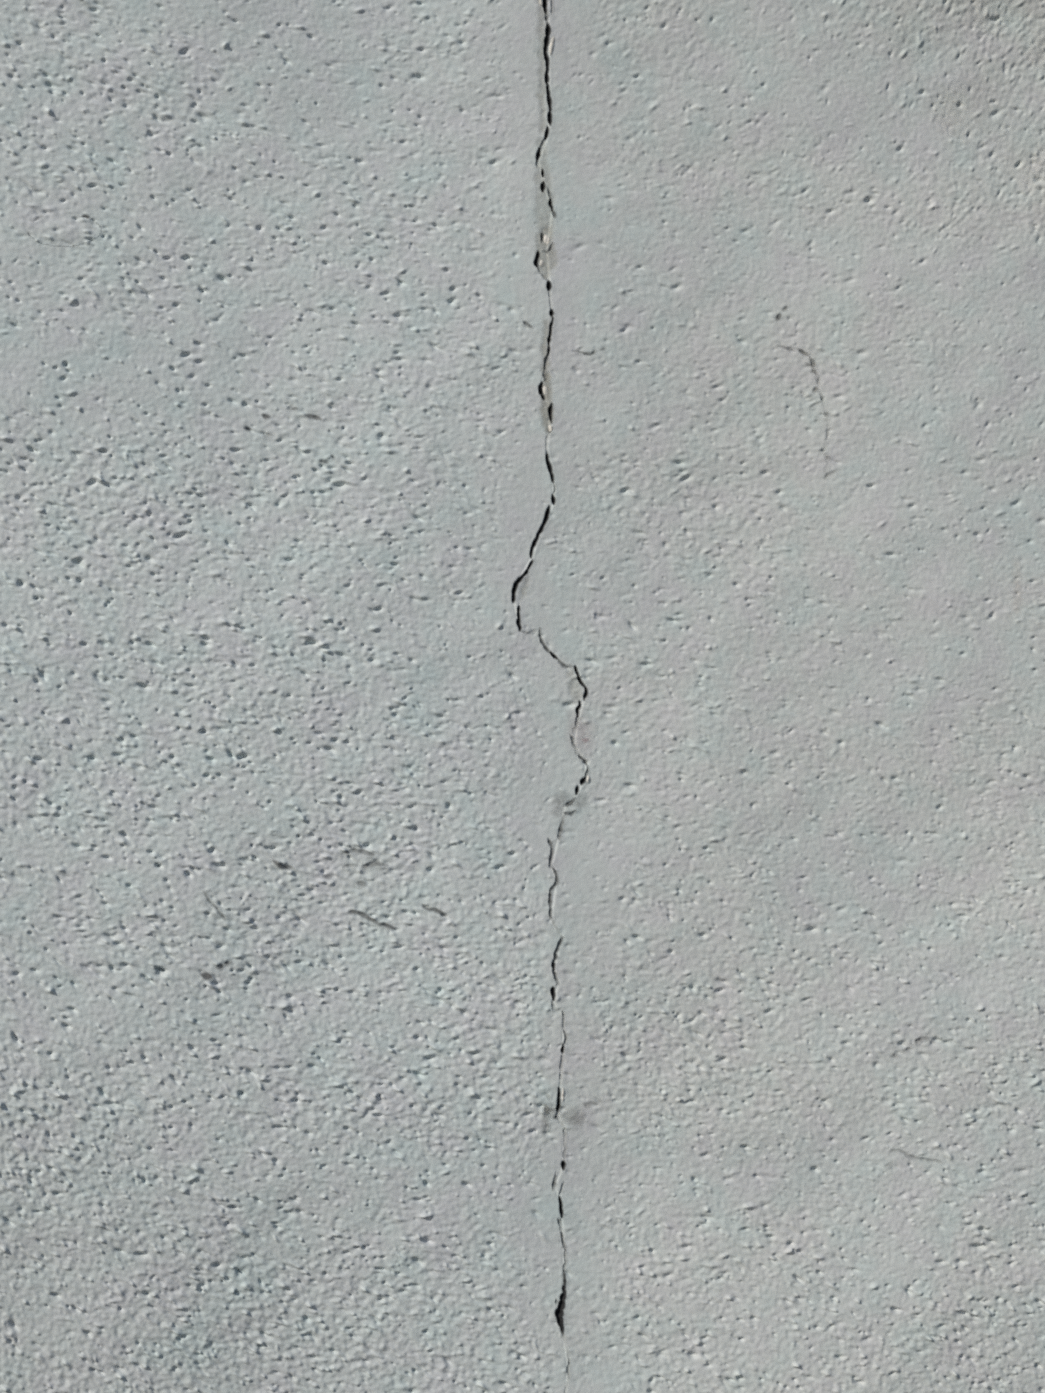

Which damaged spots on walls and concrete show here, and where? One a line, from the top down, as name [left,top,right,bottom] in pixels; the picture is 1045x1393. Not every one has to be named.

crack [512,0,588,717]
crack [548,756,590,1001]
crack [556,1088,564,1111]
crack [555,1161,566,1334]